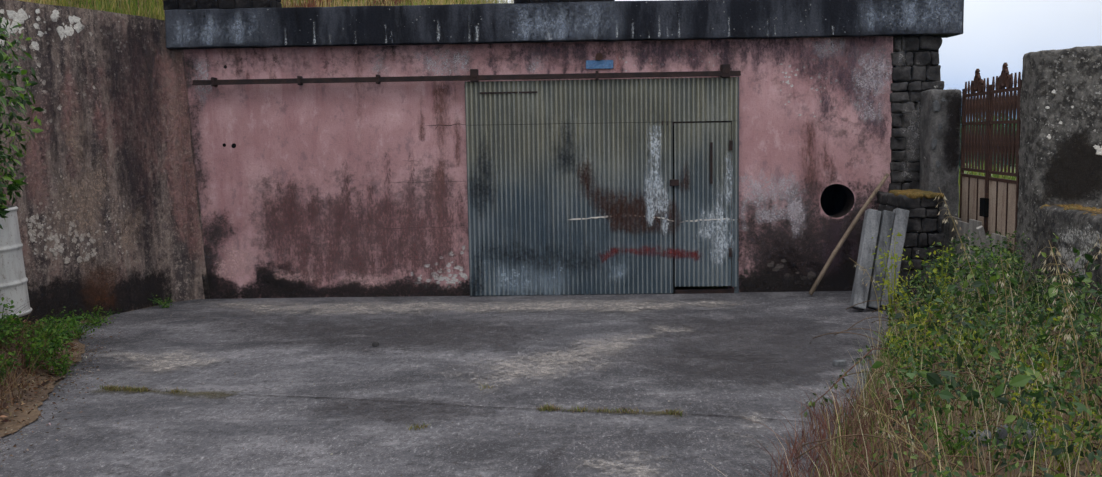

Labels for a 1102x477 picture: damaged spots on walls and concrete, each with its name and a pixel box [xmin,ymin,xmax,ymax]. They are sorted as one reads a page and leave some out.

peeling [0,8,81,68]
flaking render [11,77,96,161]
water stain [101,23,160,235]
water stain [490,15,610,75]
water stain [633,13,890,144]
flaking render [26,169,140,264]
water stain [183,60,470,299]
rust [579,166,680,232]
water stain [739,125,889,292]
water stain [20,262,172,324]